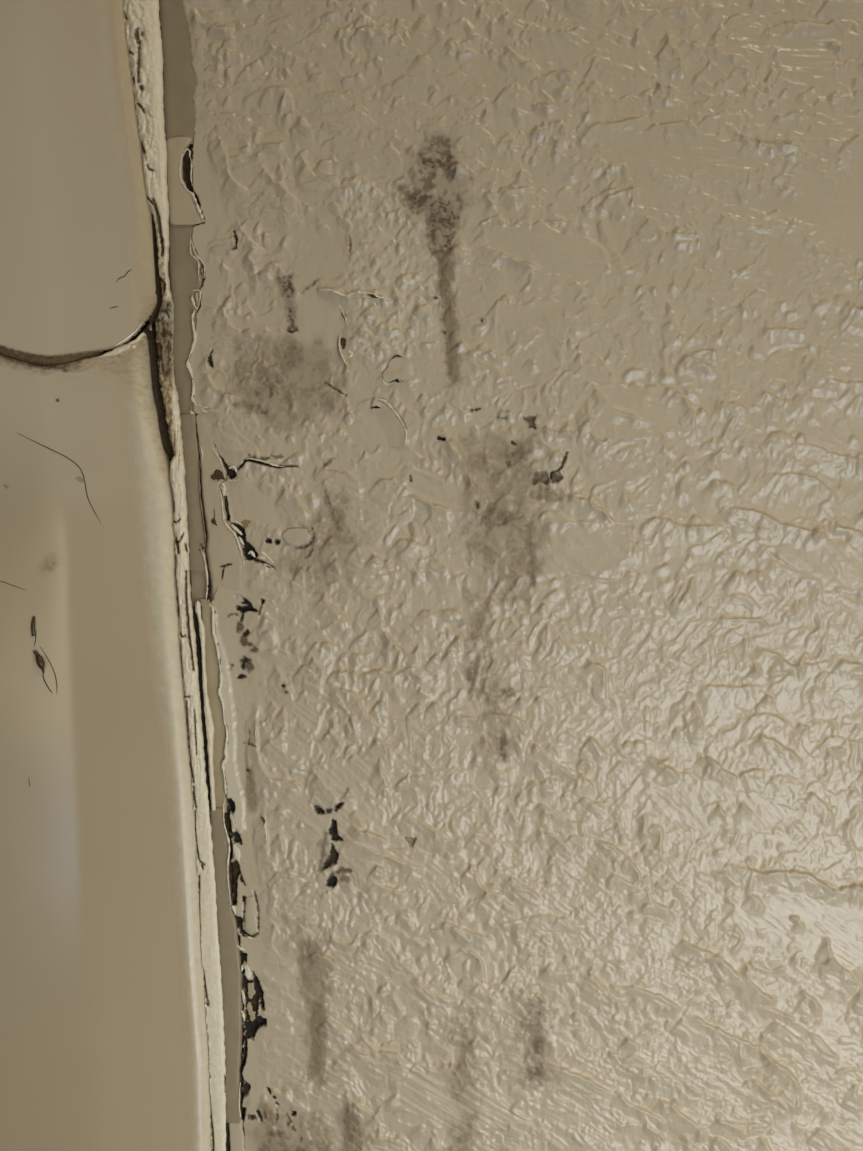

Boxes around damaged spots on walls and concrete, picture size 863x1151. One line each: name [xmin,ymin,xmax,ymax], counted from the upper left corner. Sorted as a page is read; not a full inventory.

peeling [179,148,204,222]
peeling [186,238,207,414]
damp [409,141,459,382]
spalling [200,446,285,579]
spalling [237,597,257,613]
spalling [209,603,267,1119]